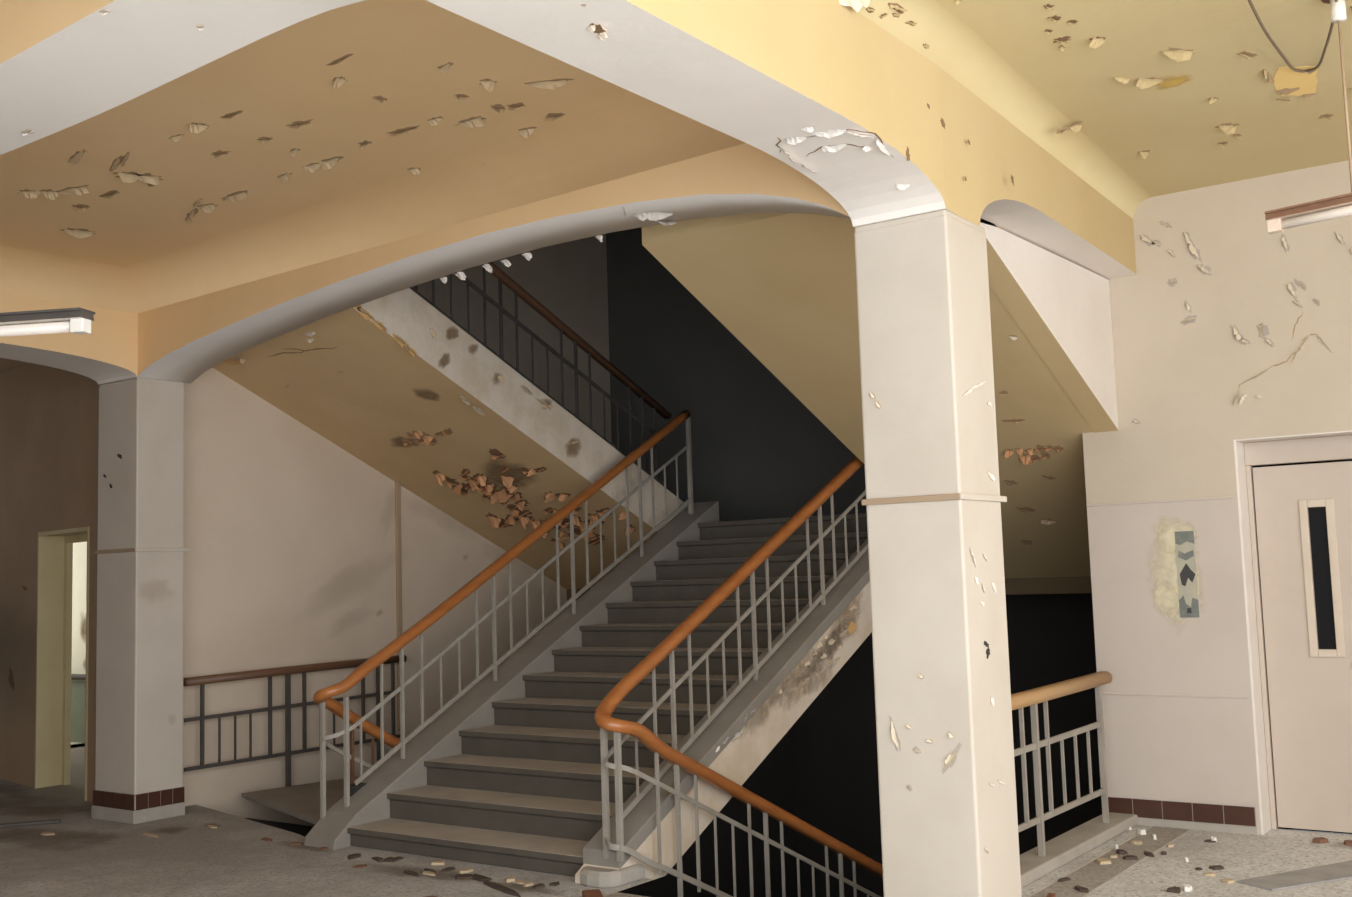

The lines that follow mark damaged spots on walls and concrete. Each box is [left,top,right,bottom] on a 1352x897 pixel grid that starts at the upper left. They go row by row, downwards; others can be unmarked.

peeling [1043,4,1078,51]
peeling [1160,47,1195,62]
peeling [1237,51,1318,101]
peeling [168,110,243,142]
peeling [388,79,525,137]
peeling [776,126,910,173]
peeling [18,152,163,211]
peeling [1139,221,1212,276]
peeling [1229,322,1275,347]
crack [1232,313,1332,406]
peeling [432,448,636,551]
peeling [889,716,934,754]